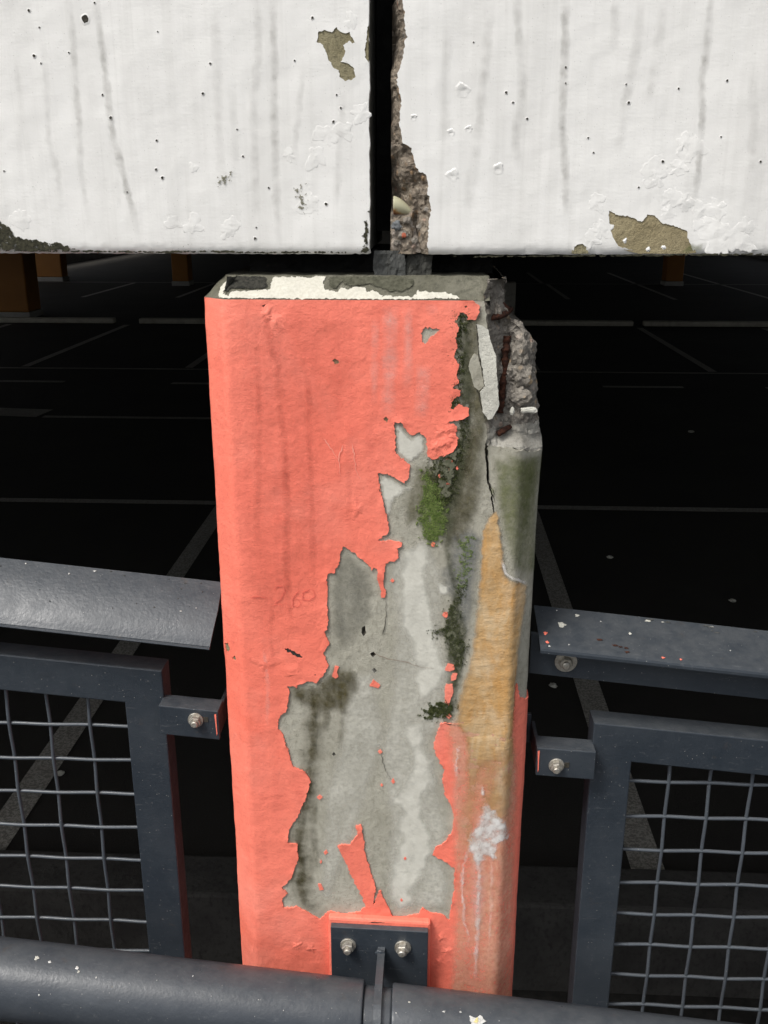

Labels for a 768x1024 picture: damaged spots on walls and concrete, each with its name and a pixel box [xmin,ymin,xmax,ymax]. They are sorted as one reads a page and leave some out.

peeling [317,26,369,81]
spalling [390,0,431,254]
peeling [572,244,588,254]
peeling [608,211,696,254]
crack [476,323,495,513]
peeling [278,265,542,920]
rust [450,512,526,996]
efflorescence [470,809,508,863]